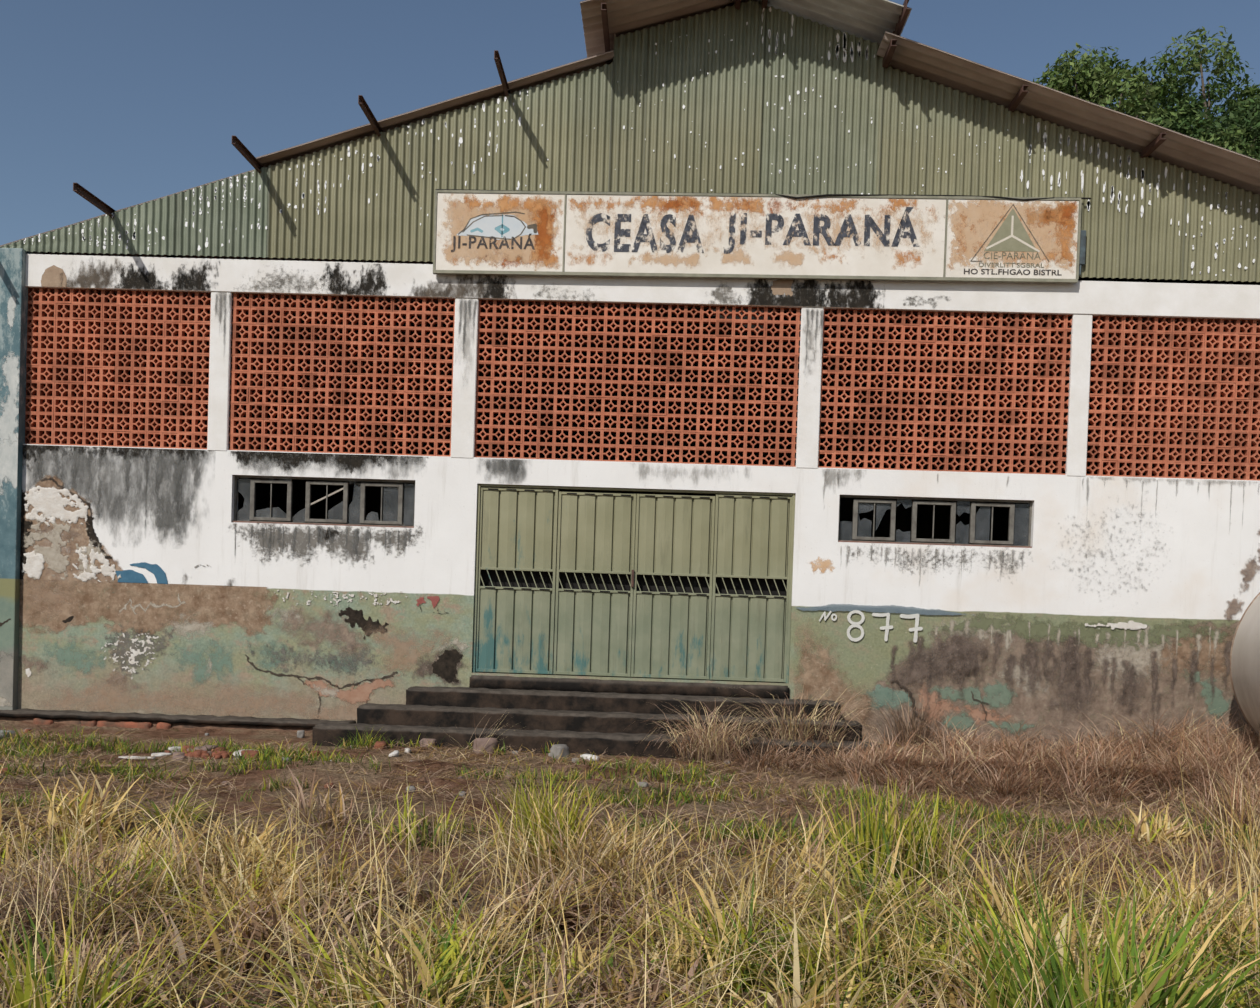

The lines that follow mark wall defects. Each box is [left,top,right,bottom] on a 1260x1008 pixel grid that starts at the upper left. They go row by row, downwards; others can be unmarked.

peeling [746,7,794,55]
peeling [821,33,875,63]
peeling [407,91,529,186]
water stain [254,263,387,295]
water stain [22,445,205,535]
peeling [0,352,407,707]
water stain [233,522,422,562]
water stain [847,547,975,568]
crack [245,655,398,721]
flaking render [415,639,468,684]
peeling [795,531,1260,749]
water stain [1050,638,1094,713]